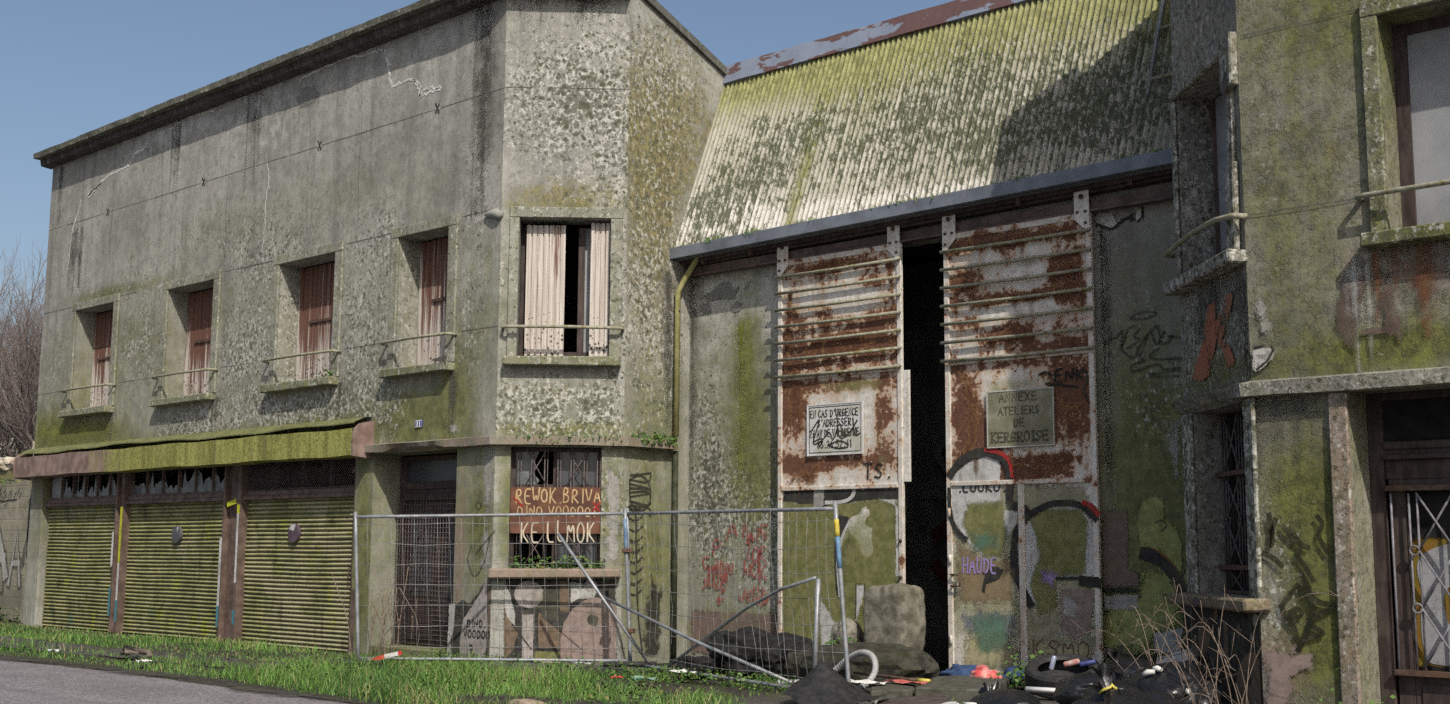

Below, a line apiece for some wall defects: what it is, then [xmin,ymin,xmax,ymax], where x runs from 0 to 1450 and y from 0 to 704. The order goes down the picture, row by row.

crack [299,41,442,98]
crack [67,110,215,270]
rust [785,257,853,281]
rust [885,262,897,309]
rust [949,244,1087,313]
rust [782,289,897,431]
rust [987,324,1021,355]
rust [957,372,980,472]
rust [1007,396,1087,487]
rust [789,460,824,485]
flaking render [1262,644,1313,704]